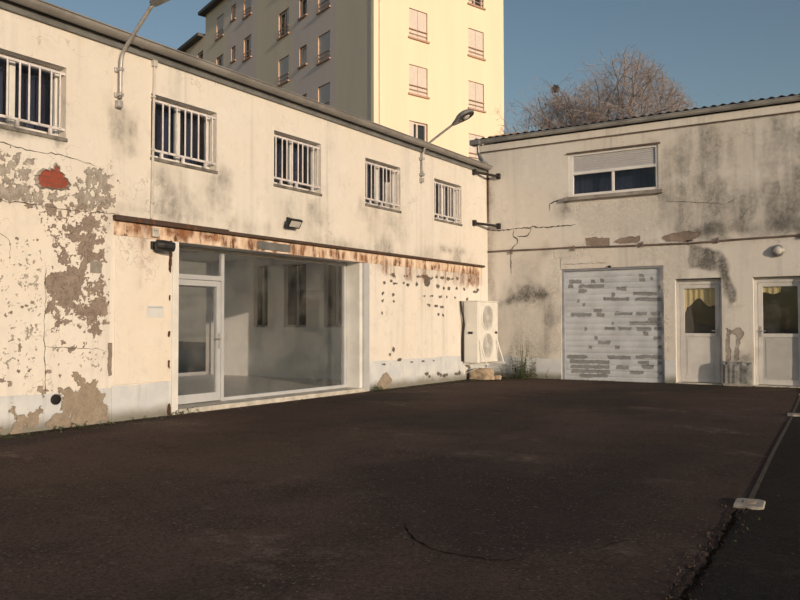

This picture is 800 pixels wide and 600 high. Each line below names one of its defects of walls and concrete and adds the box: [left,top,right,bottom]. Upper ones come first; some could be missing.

crack [488,224,576,267]
flaking render [585,236,640,246]
flaking render [662,230,700,242]
peeling [0,145,120,434]
peeling [381,273,479,317]
leakage [508,287,548,303]
leakage [691,247,738,307]
crack [43,273,107,394]
peeling [726,327,744,362]
peeling [377,347,435,390]